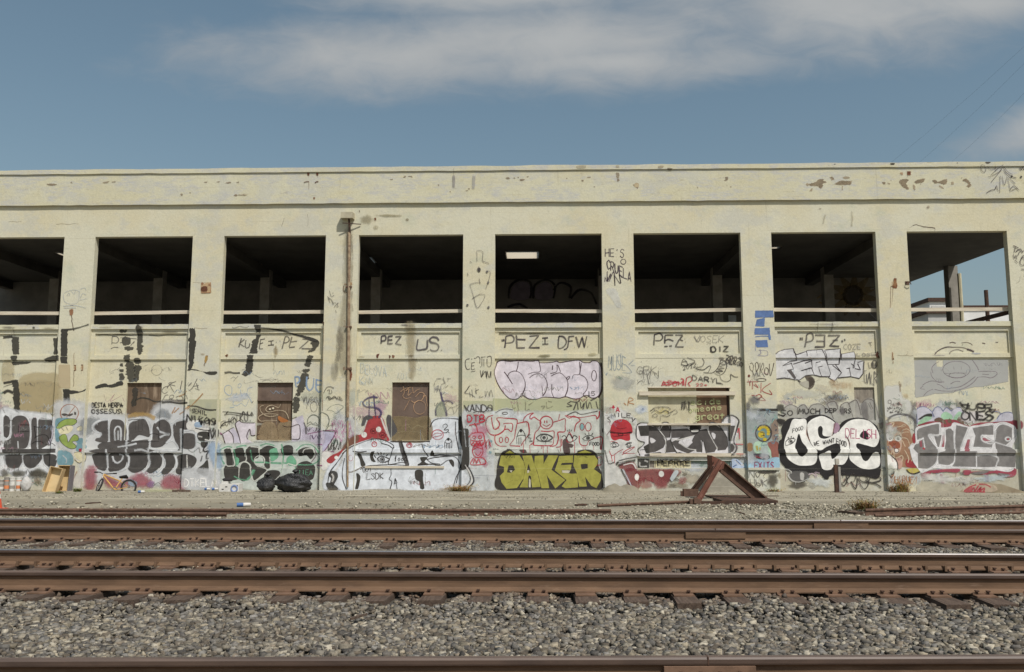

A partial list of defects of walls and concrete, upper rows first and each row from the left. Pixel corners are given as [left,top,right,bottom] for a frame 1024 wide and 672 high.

spalling [806,176,852,191]
spalling [882,179,971,190]